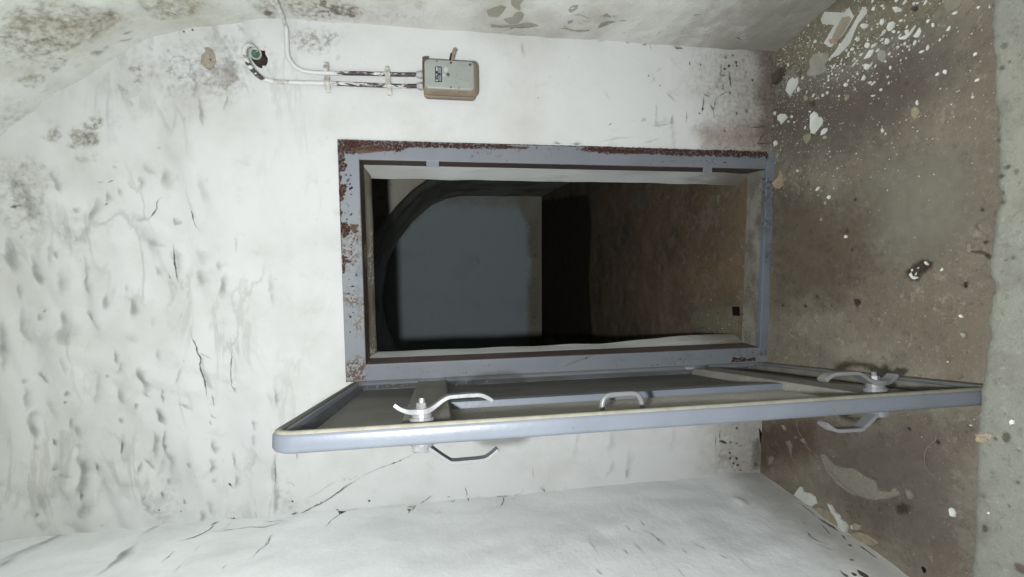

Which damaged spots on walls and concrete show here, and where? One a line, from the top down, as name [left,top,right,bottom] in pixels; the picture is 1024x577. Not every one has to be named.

damp [201,47,216,70]
peeling [785,40,829,96]
peeling [855,7,902,80]
peeling [802,128,828,145]
peeling [772,169,799,189]
rust [338,140,769,318]